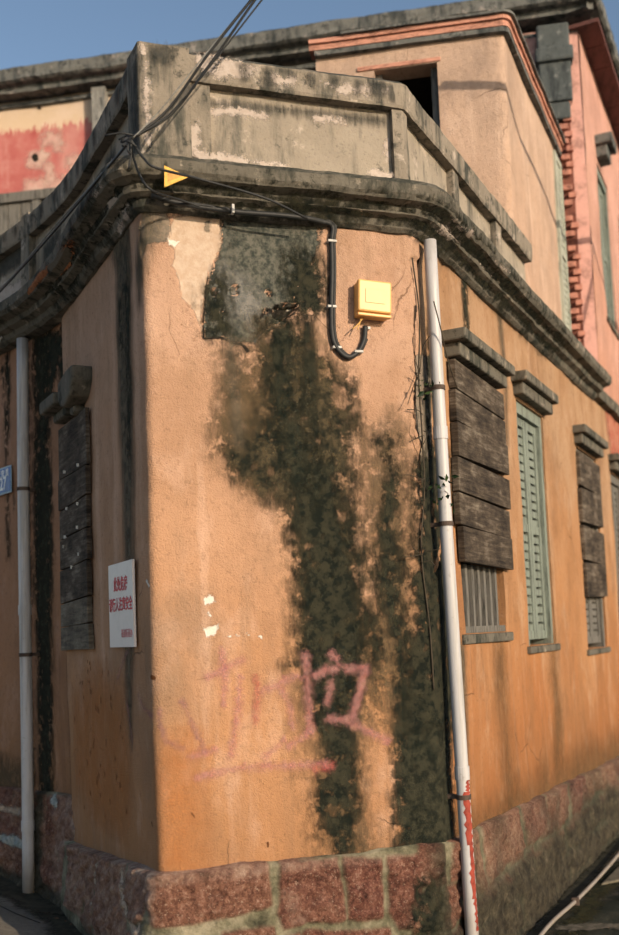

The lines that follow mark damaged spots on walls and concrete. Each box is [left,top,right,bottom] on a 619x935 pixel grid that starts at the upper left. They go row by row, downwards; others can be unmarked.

water stain [132,43,174,151]
water stain [373,83,395,100]
peeling [24,132,79,191]
flaking render [137,213,329,352]
water stain [0,351,11,464]
water stain [116,247,134,561]
water stain [221,316,459,855]